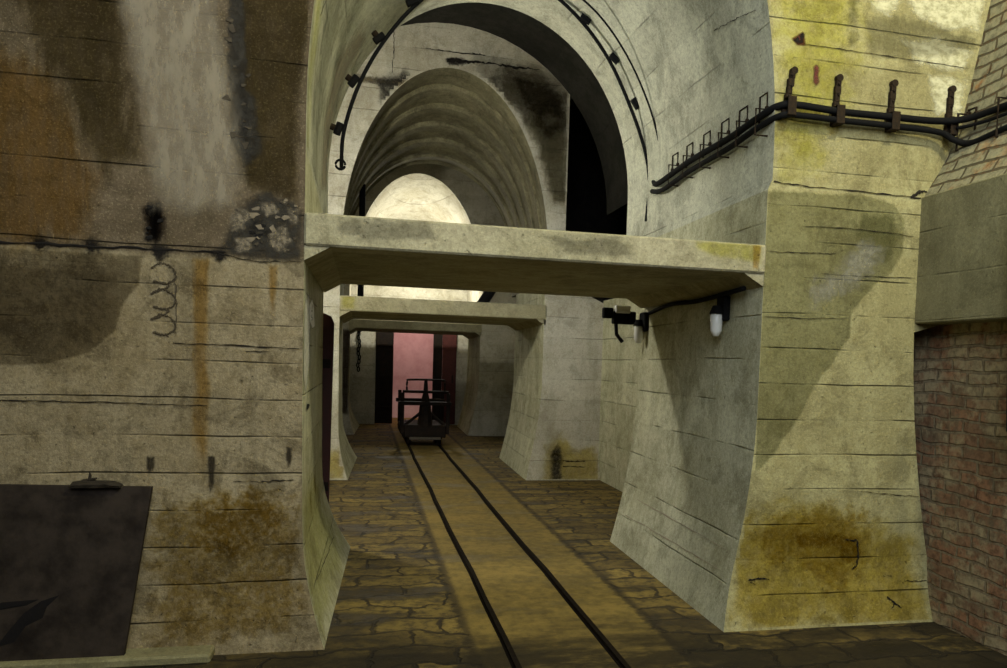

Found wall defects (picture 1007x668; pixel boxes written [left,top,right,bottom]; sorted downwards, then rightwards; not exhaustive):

damp [129,0,261,205]
peeling [226,192,301,260]
crack [0,241,296,262]
crack [173,342,299,352]
crack [0,399,207,407]
damp [551,448,562,479]